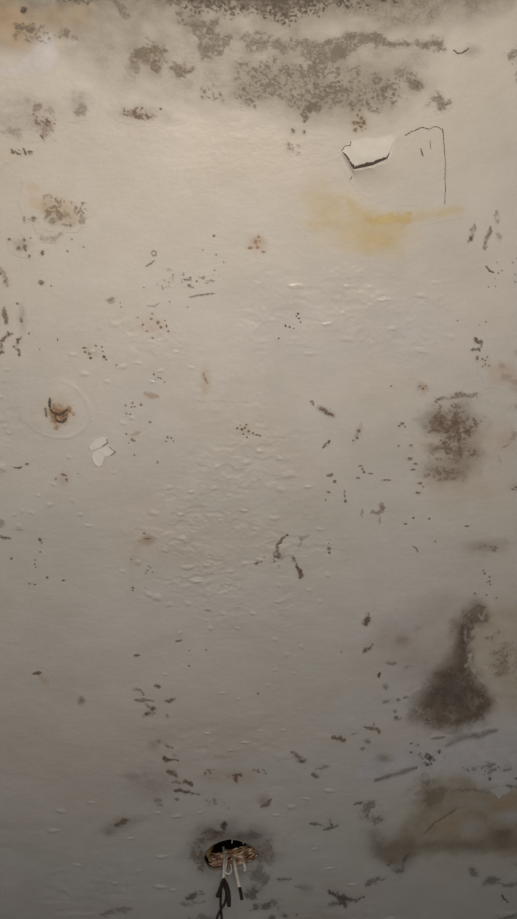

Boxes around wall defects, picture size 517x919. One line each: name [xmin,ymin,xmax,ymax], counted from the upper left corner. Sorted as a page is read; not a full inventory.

damp [0,0,517,170]
peeling [338,126,446,206]
damp [293,170,504,265]
peeling [89,437,116,467]
damp [309,399,337,420]
damp [398,321,517,520]
damp [253,533,310,580]
damp [132,684,177,719]
damp [331,525,517,810]
spalling [205,839,256,866]
damp [91,737,425,919]
damp [476,826,517,867]